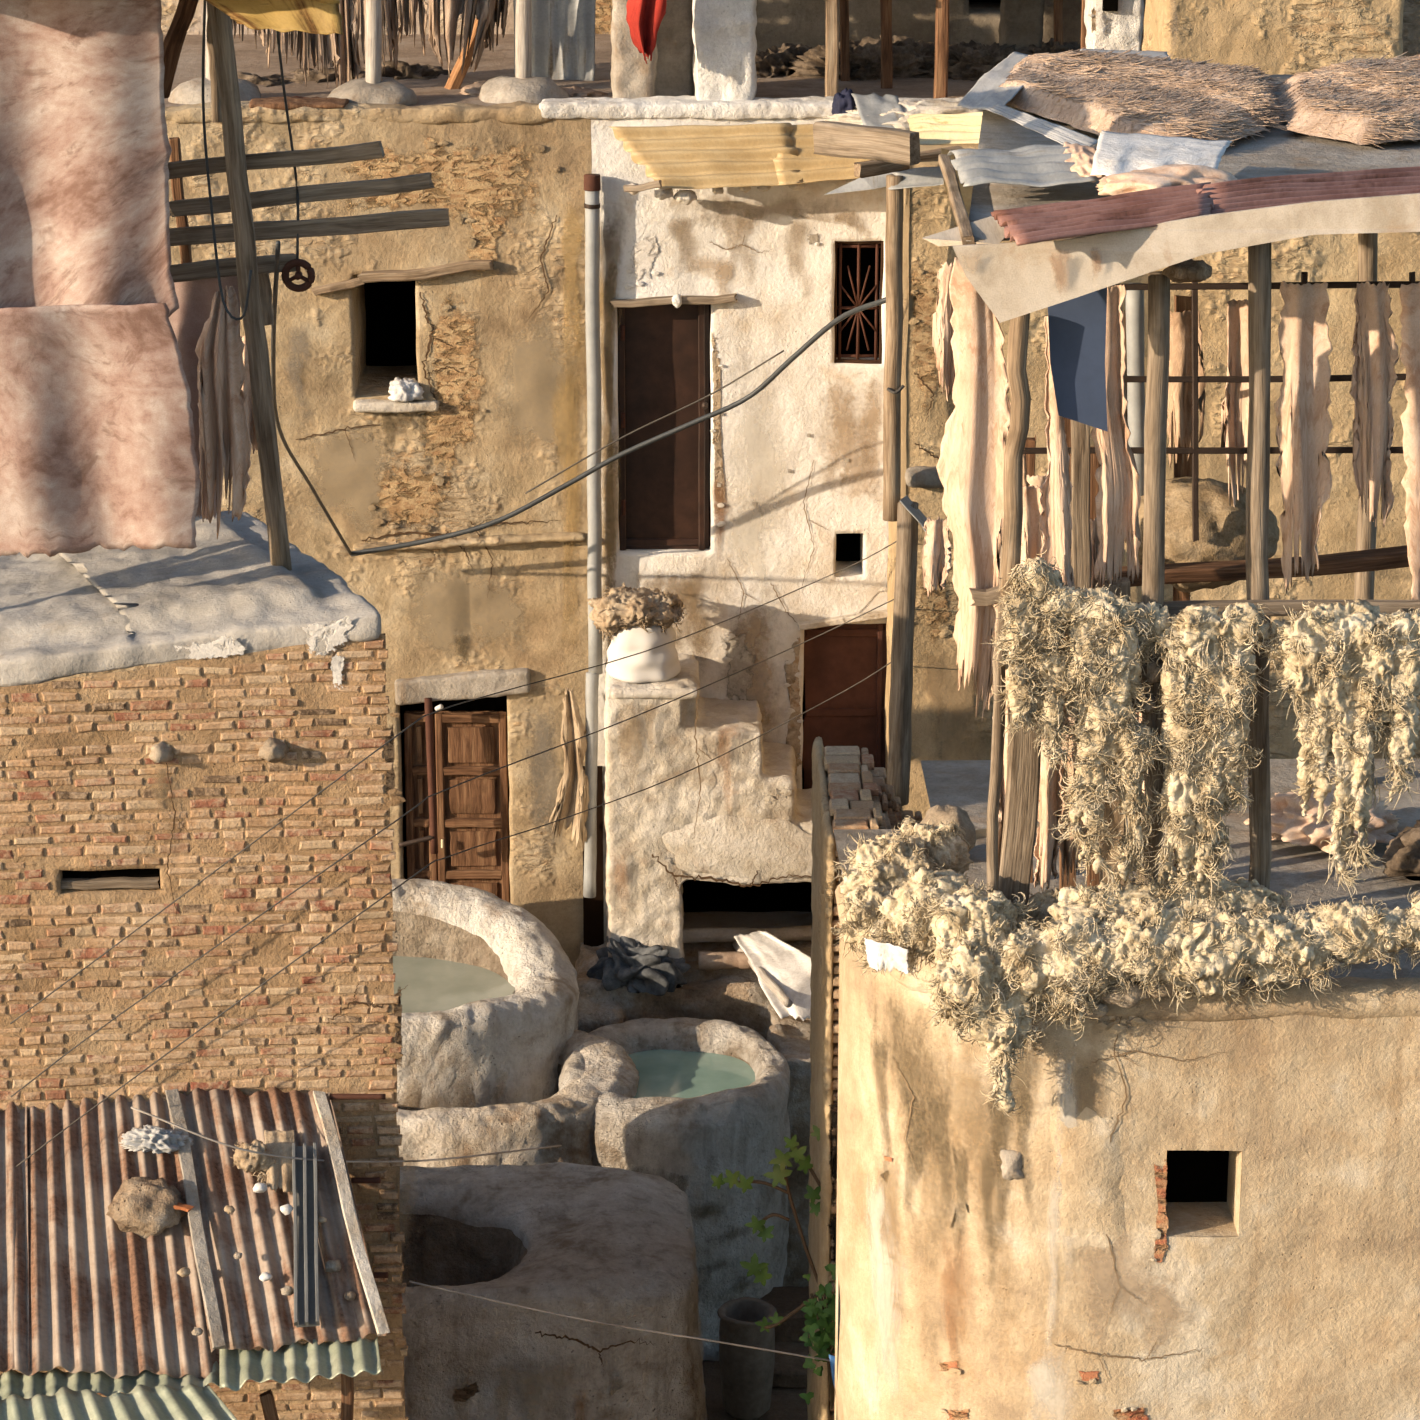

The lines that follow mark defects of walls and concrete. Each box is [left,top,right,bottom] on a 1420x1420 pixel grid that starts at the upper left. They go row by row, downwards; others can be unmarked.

spalling [343,137,545,273]
crack [524,215,557,325]
spalling [368,294,487,531]
damp [830,391,878,481]
crack [727,460,830,624]
crack [166,763,186,926]
damp [874,1020,966,1201]
damp [984,1050,1035,1232]
spalling [1148,1160,1169,1263]
crack [1092,1016,1229,1143]